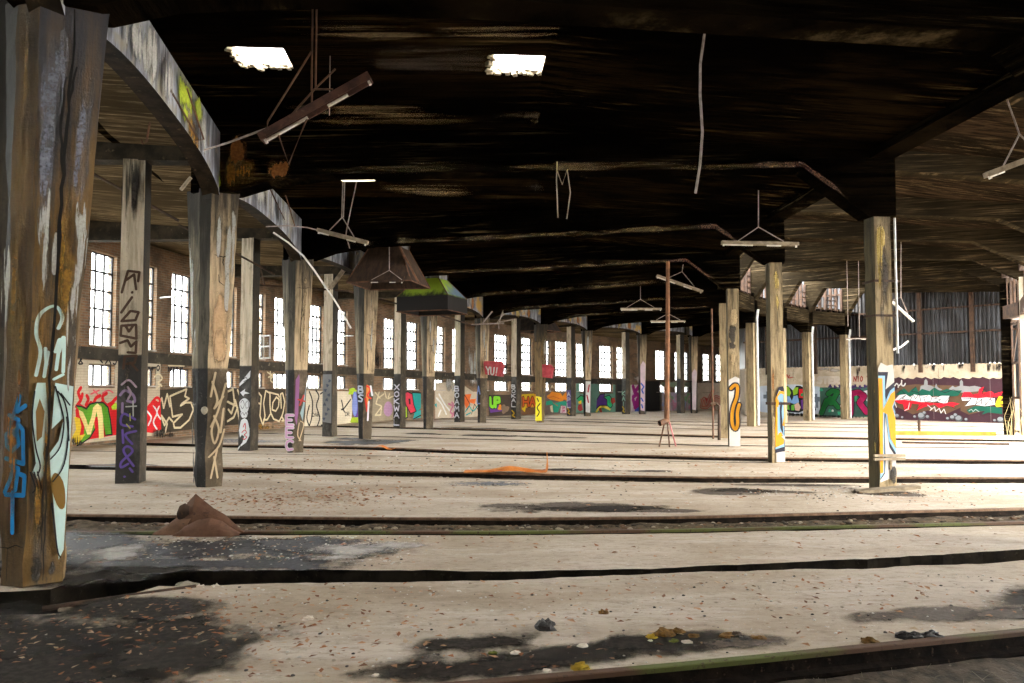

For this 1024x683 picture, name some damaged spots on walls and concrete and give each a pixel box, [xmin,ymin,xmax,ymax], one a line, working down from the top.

leakage [18,32,91,206]
corrosion [219,134,254,188]
corrosion [268,161,289,179]
leakage [10,244,24,367]
crack [0,9,78,581]
leakage [58,205,74,319]
leakage [4,400,16,493]
leakage [34,392,49,536]